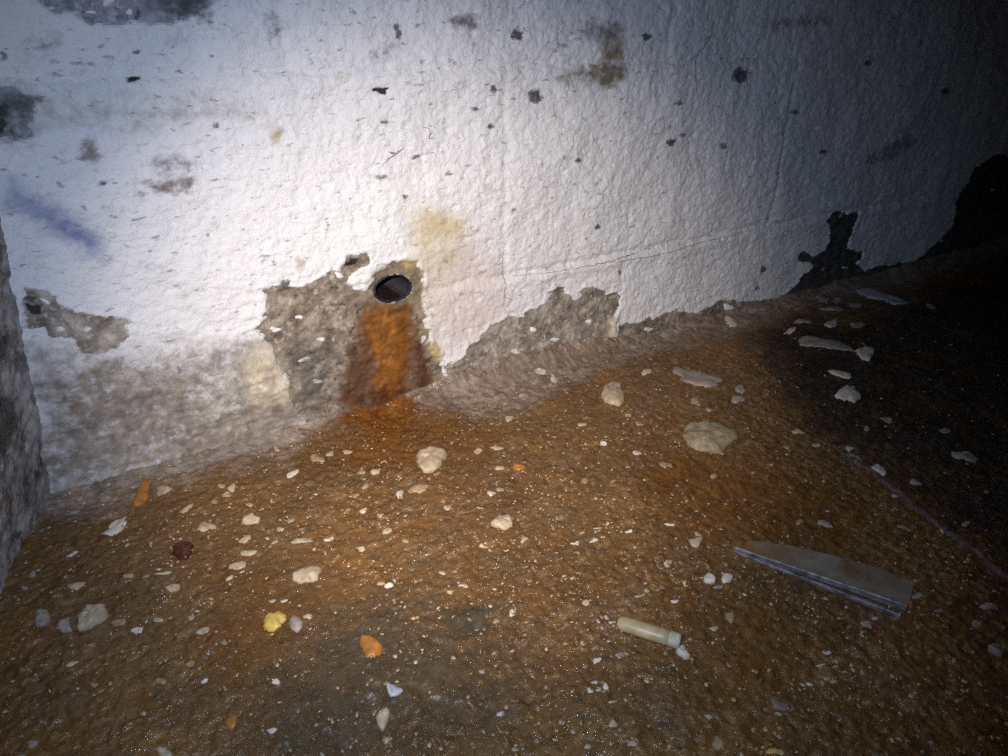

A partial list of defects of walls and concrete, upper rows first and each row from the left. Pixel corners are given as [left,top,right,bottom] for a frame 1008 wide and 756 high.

peeling [23,288,131,354]
corrosion [315,303,491,468]
peeling [255,154,1008,421]